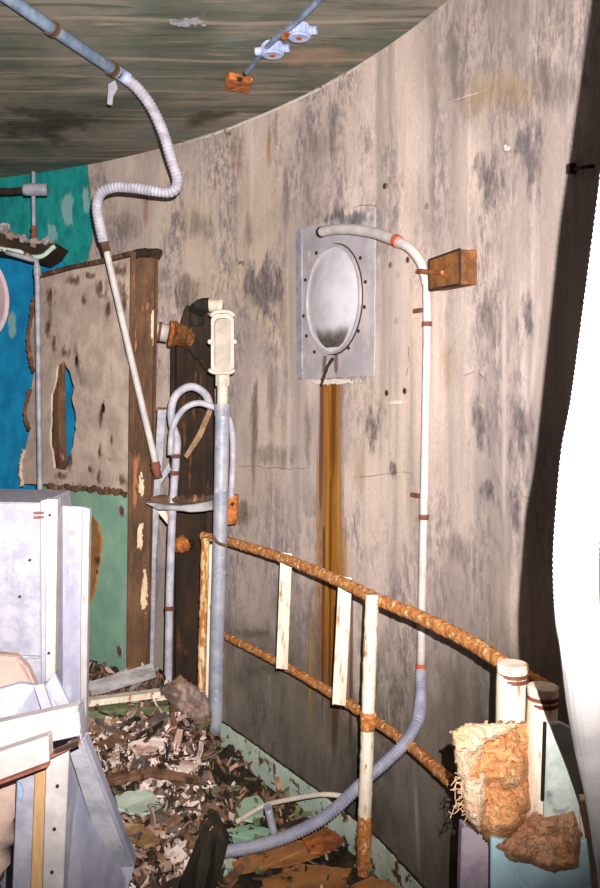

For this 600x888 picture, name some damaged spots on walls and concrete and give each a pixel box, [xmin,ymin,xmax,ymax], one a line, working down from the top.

damp [476,161,494,197]
damp [516,135,535,183]
damp [244,255,283,314]
peeling [0,165,93,490]
damp [366,410,379,449]
damp [473,399,486,447]
corrosion [321,378,342,575]
corrosion [320,580,338,688]